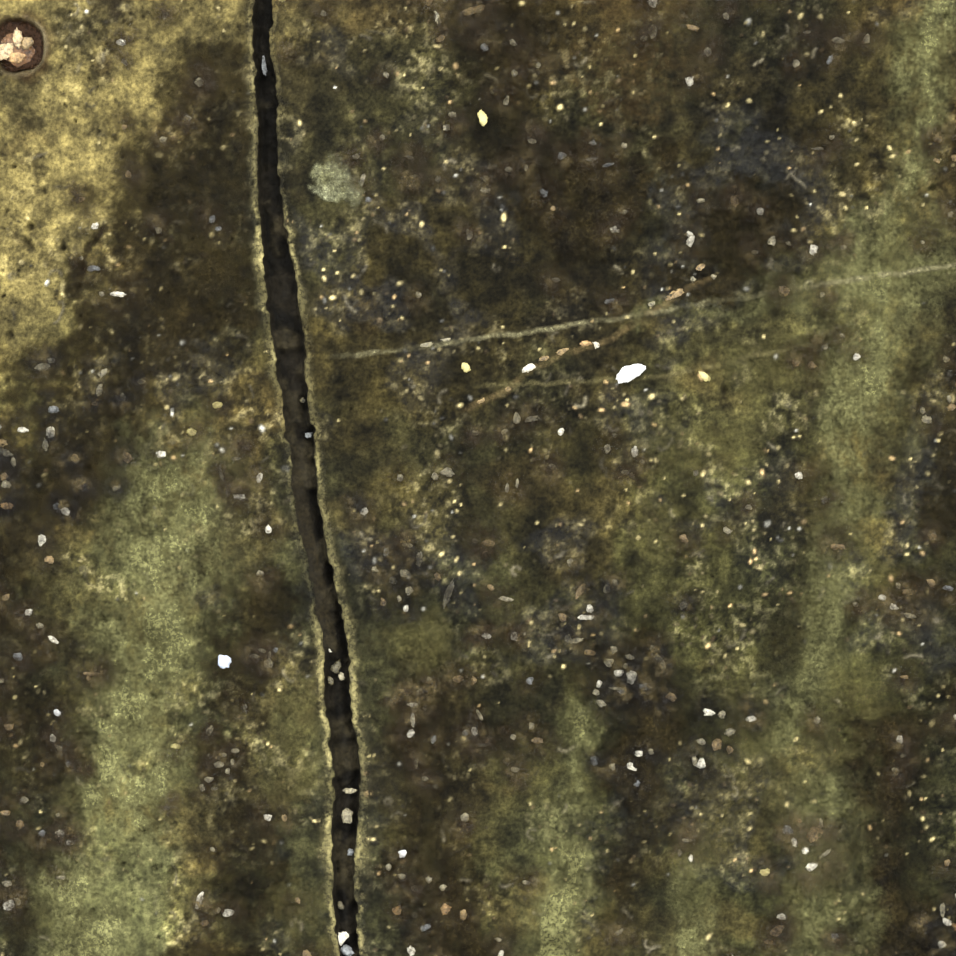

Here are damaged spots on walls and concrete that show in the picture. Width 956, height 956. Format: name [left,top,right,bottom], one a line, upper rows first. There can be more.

water stain [897,0,955,134]
water stain [884,153,928,219]
crack [420,338,451,347]
crack [477,316,625,404]
crack [648,264,716,314]
water stain [809,241,920,519]
crack [825,265,952,285]
water stain [0,25,300,956]
crack [243,0,375,956]
water stain [787,531,844,638]
water stain [841,686,956,956]